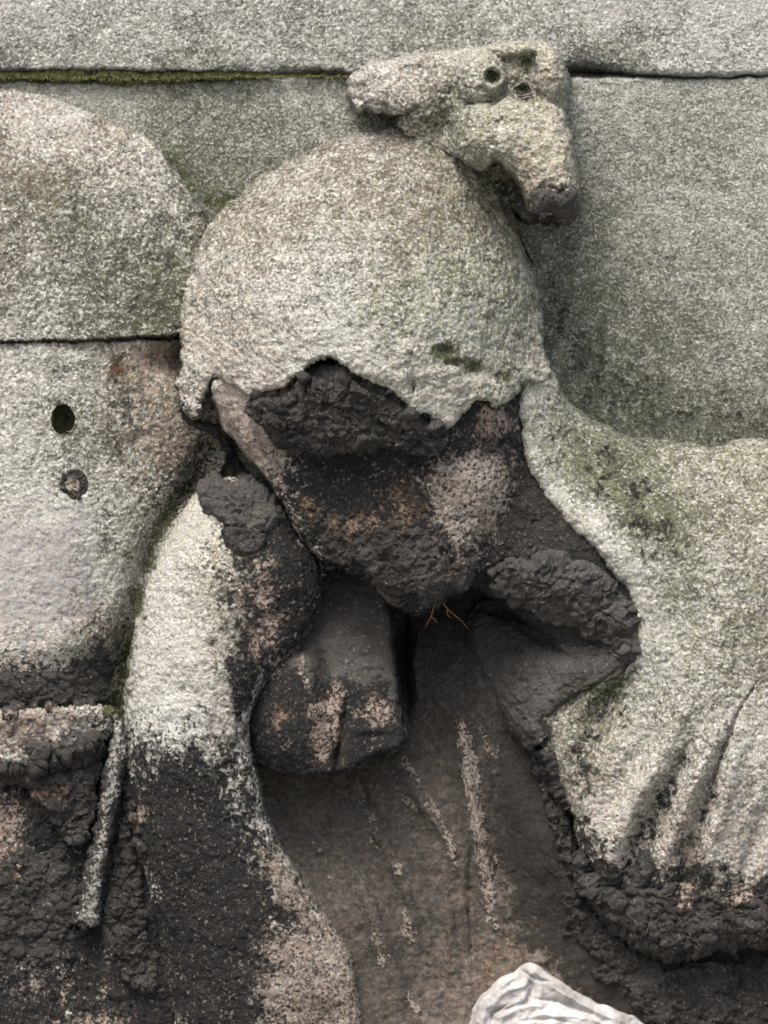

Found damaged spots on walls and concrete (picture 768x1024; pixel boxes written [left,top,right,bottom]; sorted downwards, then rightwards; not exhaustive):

peeling [378,393,425,431]
spalling [299,403,521,576]
spalling [221,526,315,689]
spalling [307,681,392,765]
water stain [540,719,553,747]
water stain [569,682,636,801]
water stain [76,723,126,927]
water stain [573,776,678,892]
water stain [676,782,718,887]